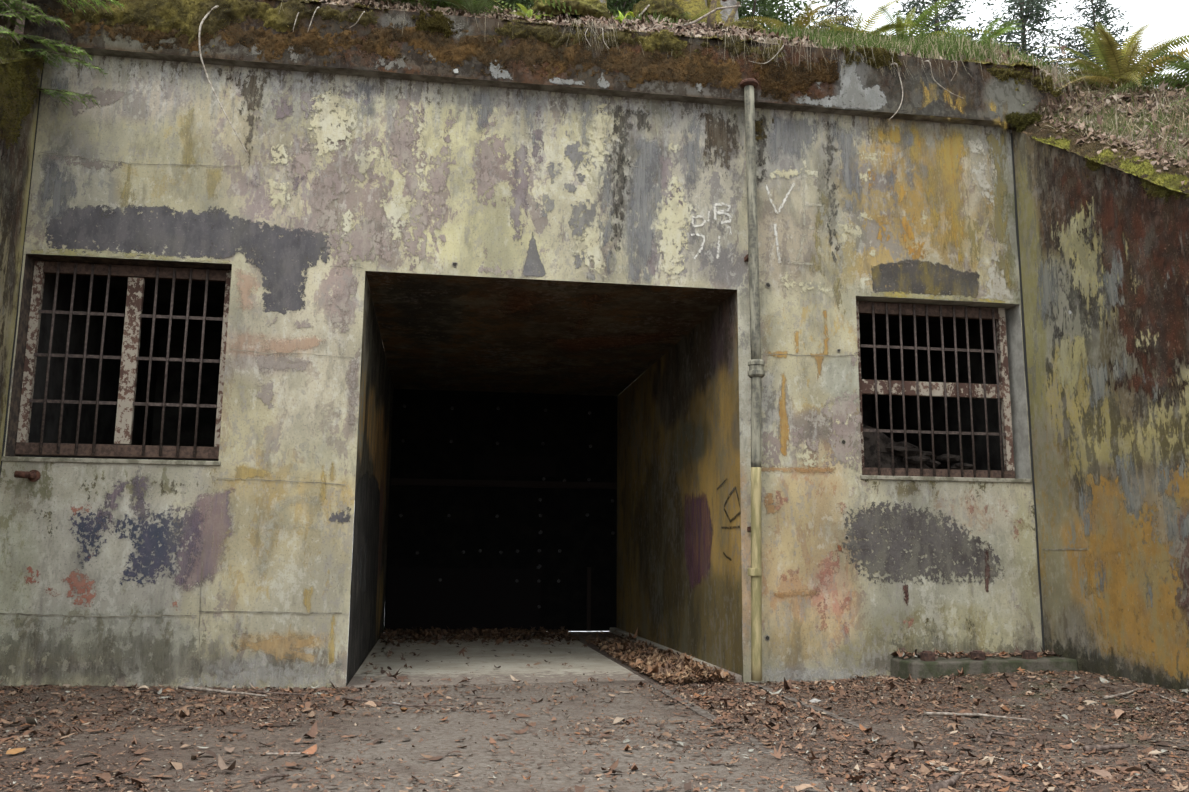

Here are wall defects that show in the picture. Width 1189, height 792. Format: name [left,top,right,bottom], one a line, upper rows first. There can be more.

spalling [375,56,411,71]
spalling [490,60,513,80]
peeling [246,73,613,409]
peeling [647,139,698,283]